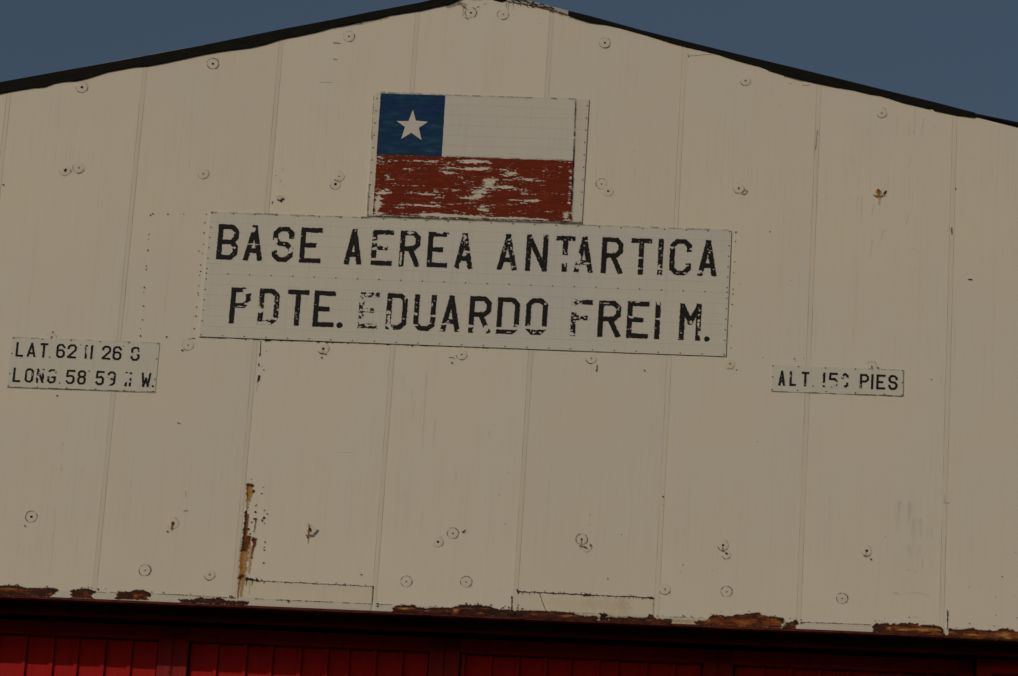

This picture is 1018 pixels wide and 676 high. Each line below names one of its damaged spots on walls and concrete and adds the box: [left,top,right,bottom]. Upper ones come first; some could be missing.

corrosion [0,483,1018,642]